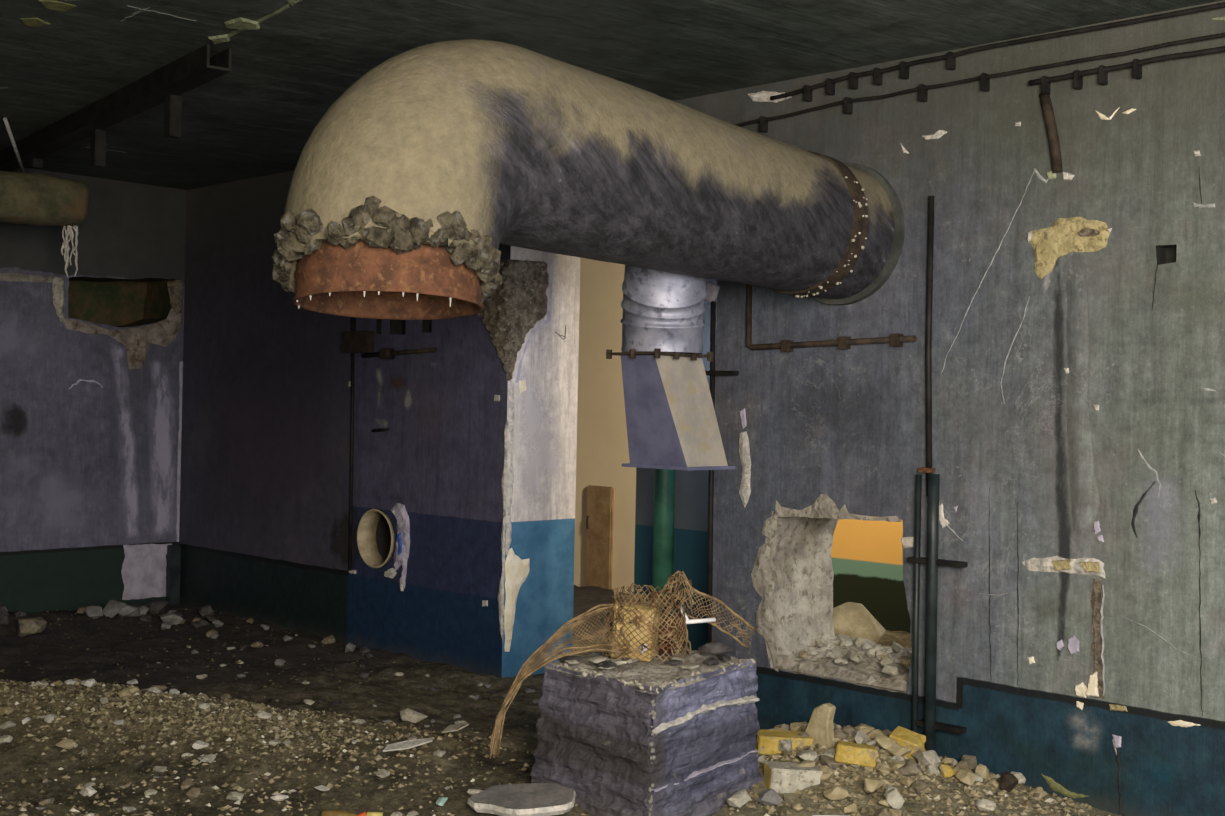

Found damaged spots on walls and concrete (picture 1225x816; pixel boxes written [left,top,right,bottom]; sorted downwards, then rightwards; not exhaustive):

peeling [20,0,77,27]
spalling [1027,217,1112,285]
spalling [0,273,183,370]
spalling [477,259,553,652]
spalling [751,494,902,671]
peeling [900,537,914,548]
peeling [1093,521,1104,542]
spalling [1022,556,1128,712]
spalling [546,658,760,764]